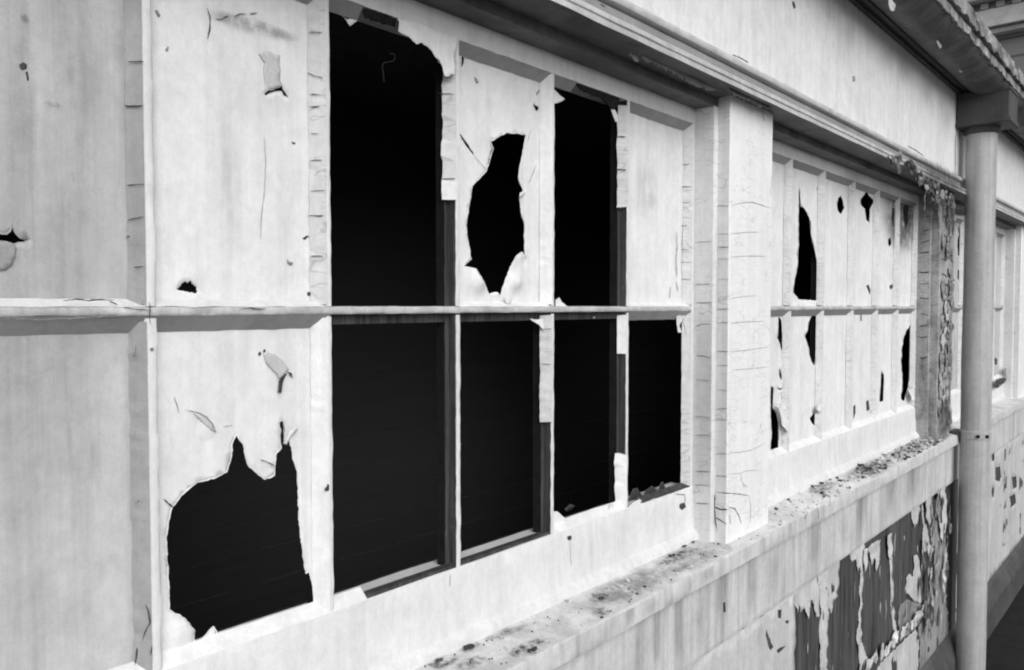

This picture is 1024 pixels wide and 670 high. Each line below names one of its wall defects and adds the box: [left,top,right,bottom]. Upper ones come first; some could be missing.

peeling [0,242,16,270]
crack [259,138,267,239]
crack [670,164,765,436]
peeling [887,151,956,427]
crack [677,442,766,529]
peeling [778,487,952,670]